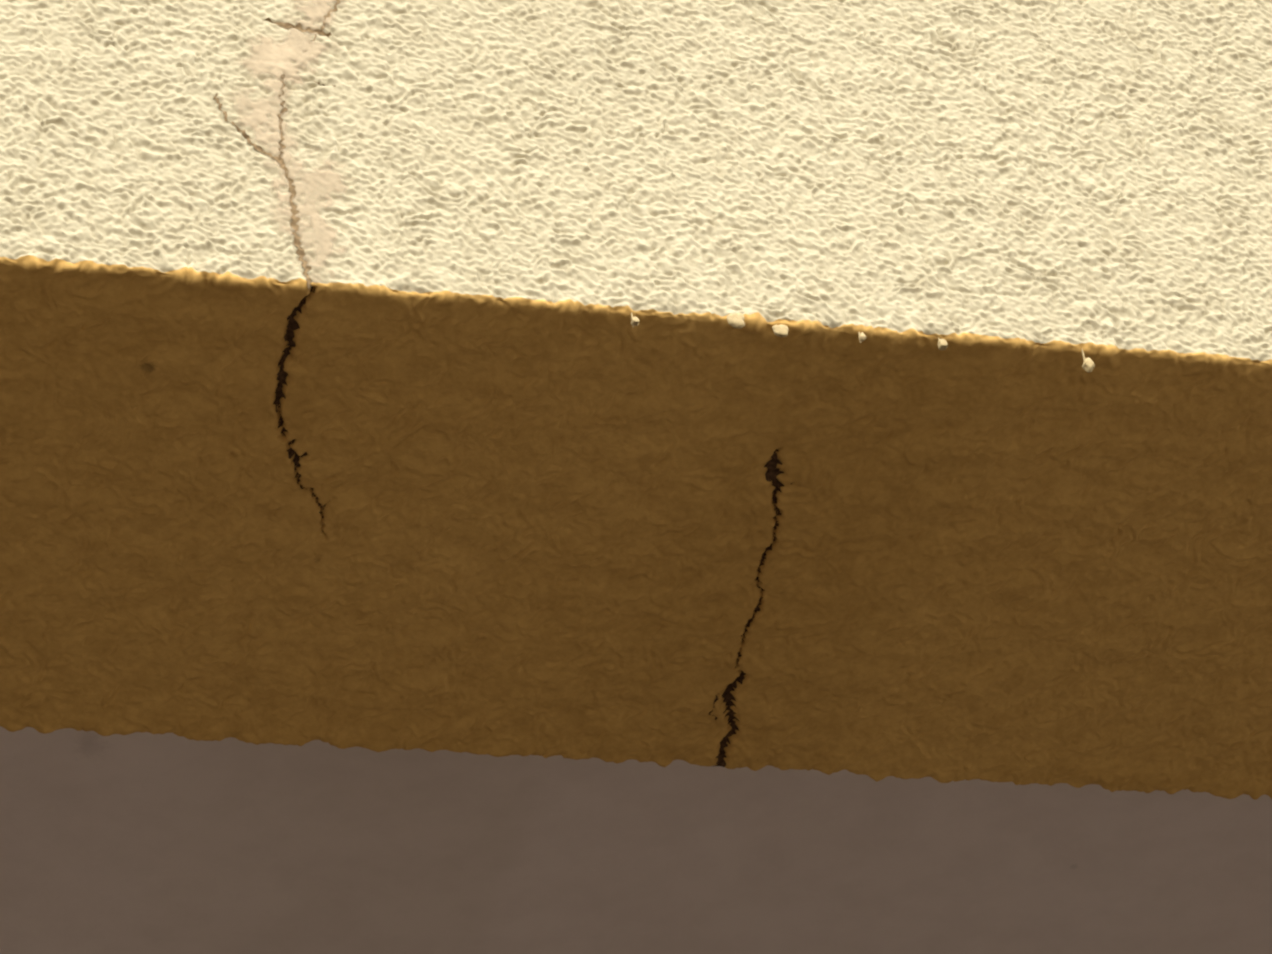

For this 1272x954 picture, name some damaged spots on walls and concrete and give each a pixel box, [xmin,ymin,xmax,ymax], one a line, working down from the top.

crack [303,0,340,52]
crack [214,75,328,525]
crack [709,449,792,767]